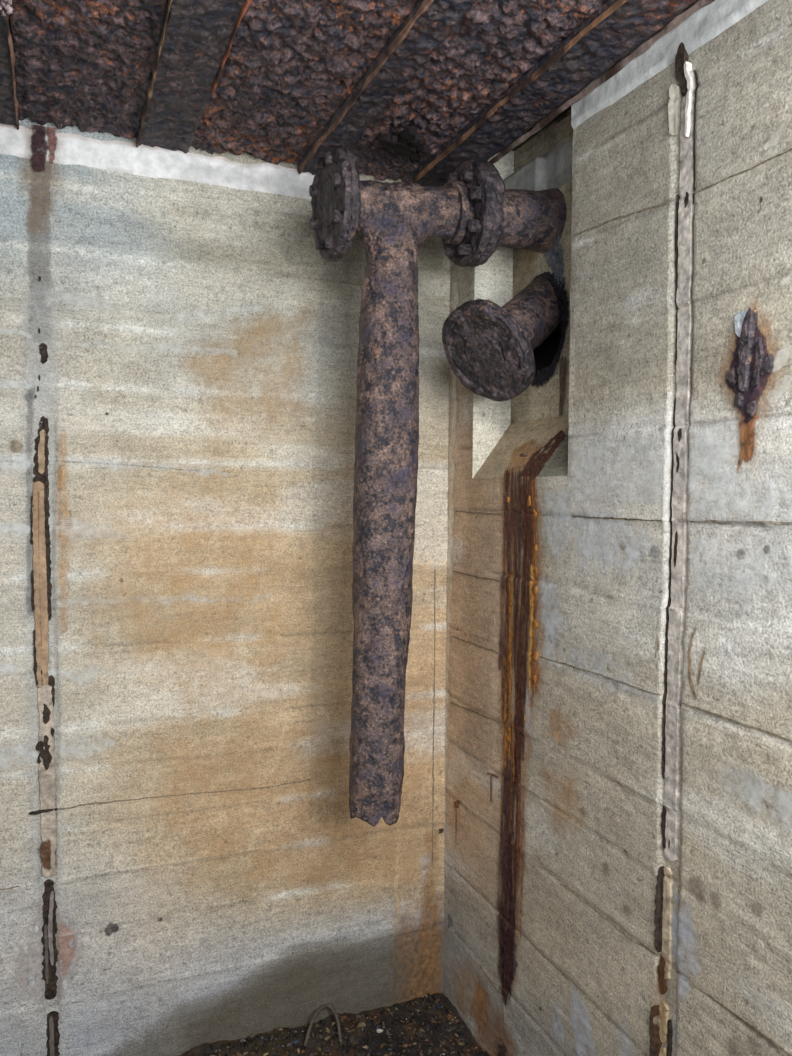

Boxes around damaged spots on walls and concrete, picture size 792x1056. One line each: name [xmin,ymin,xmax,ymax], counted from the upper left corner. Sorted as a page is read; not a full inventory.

corrosion [31,125,57,172]
corrosion [371,127,432,163]
leakage [48,513,112,537]
corrosion [487,430,566,1005]